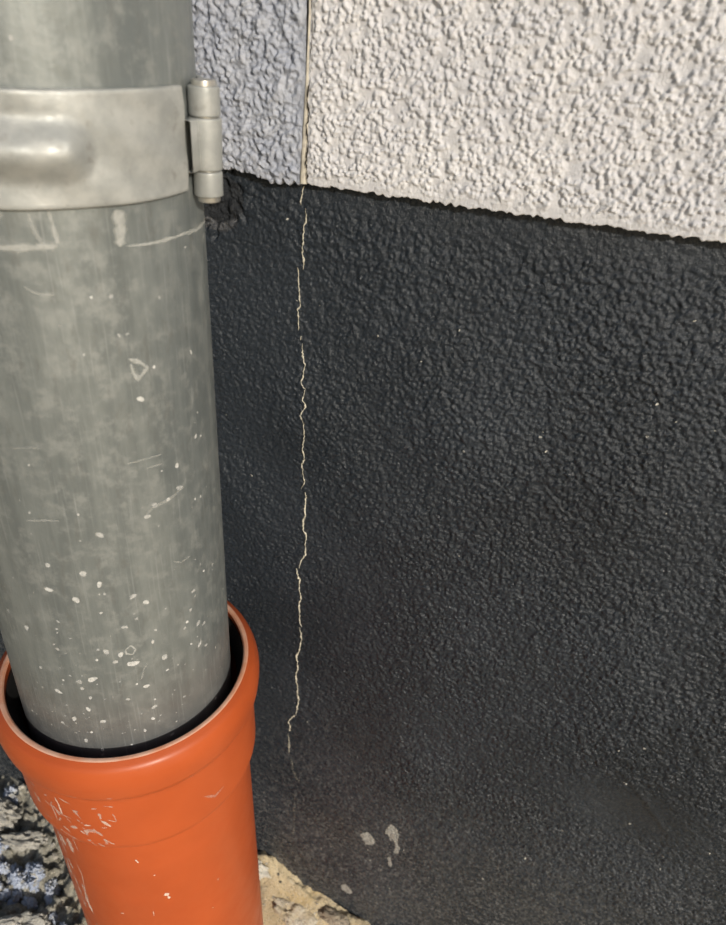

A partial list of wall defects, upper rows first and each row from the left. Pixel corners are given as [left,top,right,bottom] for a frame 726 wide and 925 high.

spalling [204,172,244,231]
crack [288,0,313,731]